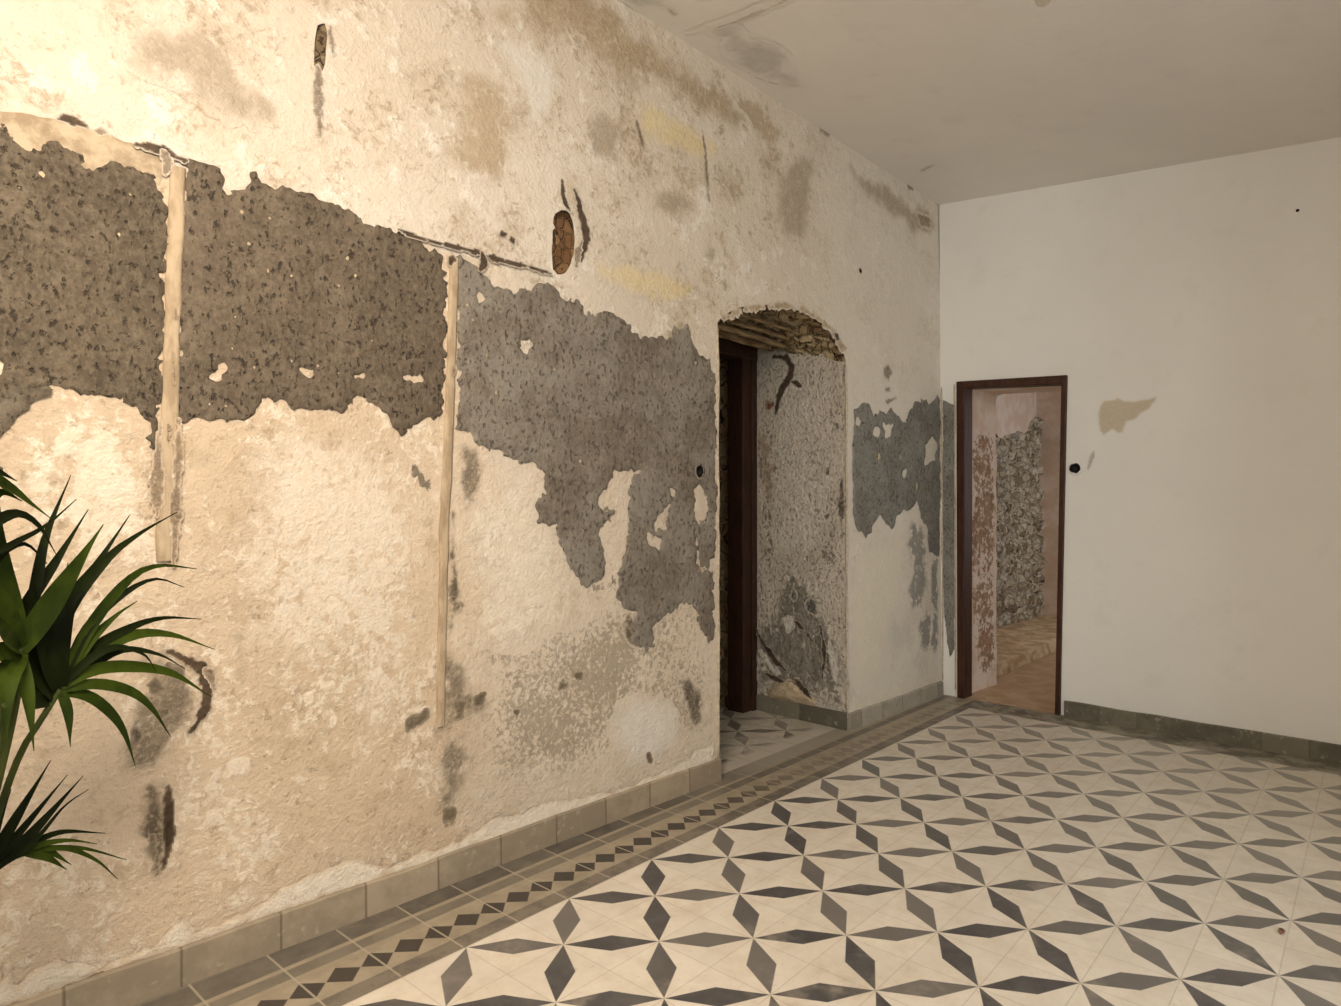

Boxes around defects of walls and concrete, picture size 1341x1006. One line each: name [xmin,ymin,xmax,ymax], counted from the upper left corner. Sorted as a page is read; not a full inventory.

leakage [703,22,807,90]
peeling [0,111,163,185]
spalling [447,254,458,267]
spalling [1097,395,1158,436]
peeling [0,383,155,573]
peeling [457,441,717,803]